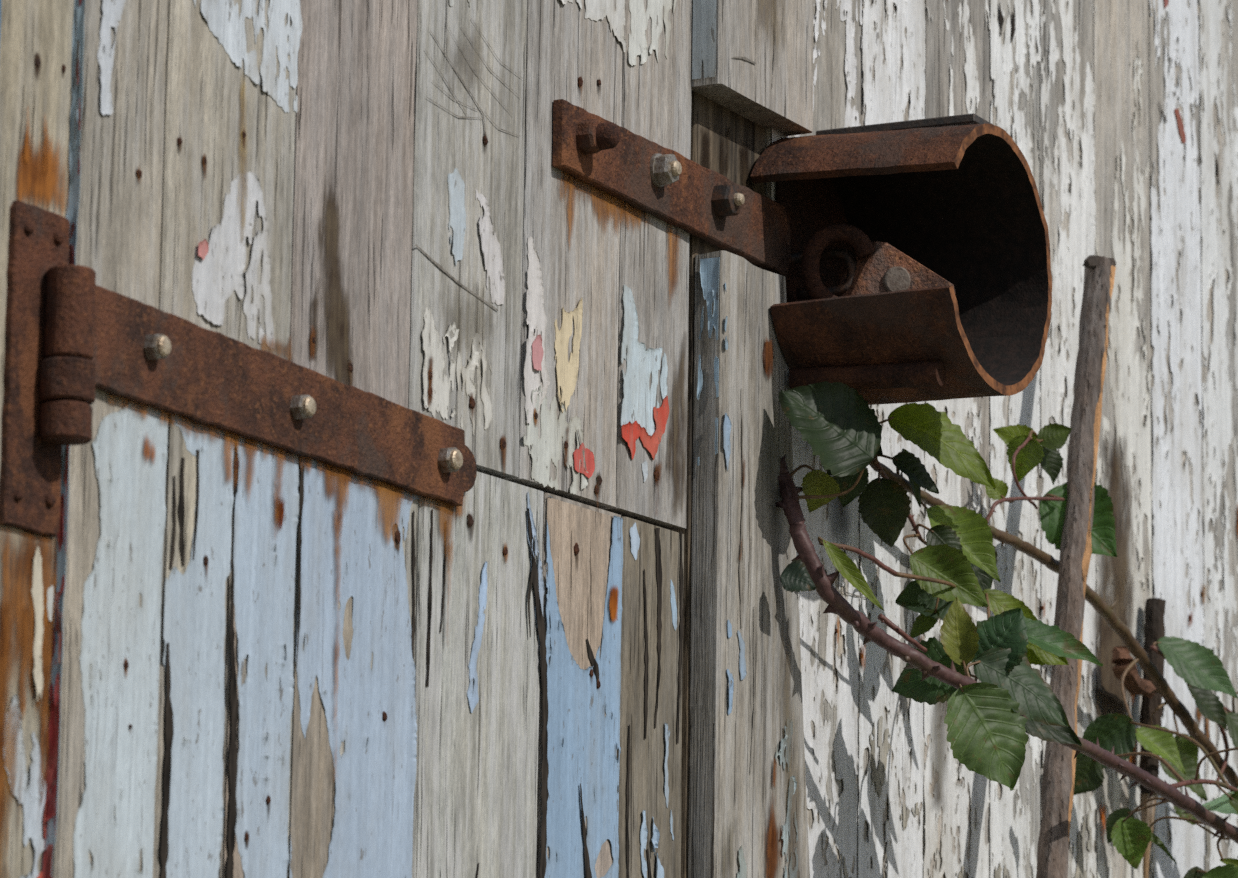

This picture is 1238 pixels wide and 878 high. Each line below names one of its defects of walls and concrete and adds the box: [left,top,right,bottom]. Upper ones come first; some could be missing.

rust [0,531,57,872]
peeling [3,546,65,878]
rust [17,118,65,212]
peeling [191,172,275,349]
peeling [73,400,420,878]
rust [111,394,474,601]
peeling [523,237,640,878]
rust [561,172,647,241]
peeling [620,285,668,436]
rust [669,226,679,292]
rust [765,339,773,377]
peeling [772,0,1238,878]